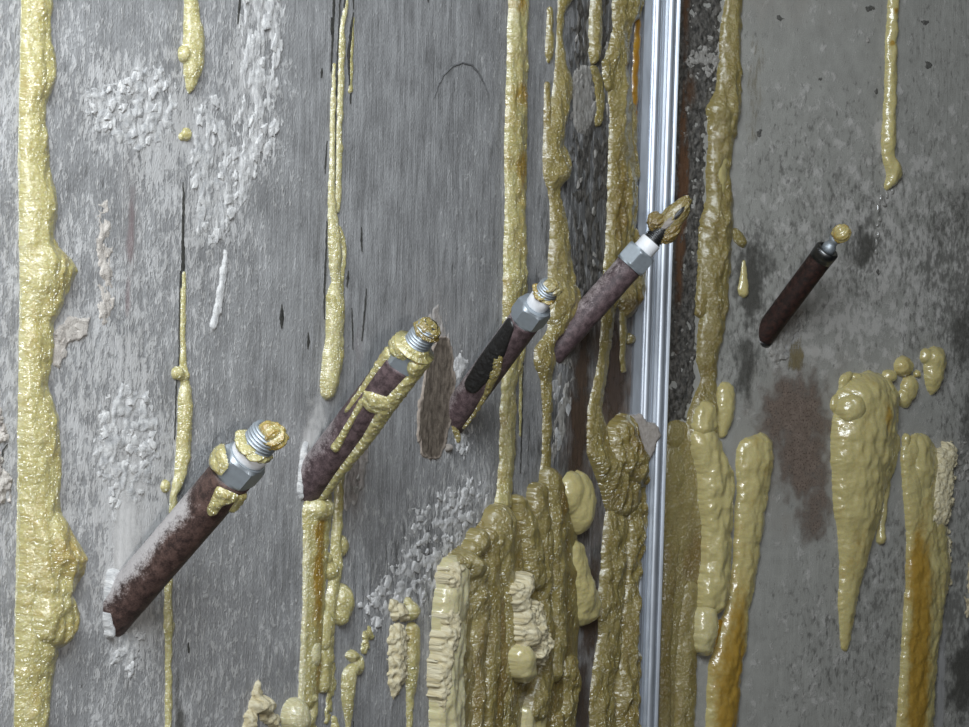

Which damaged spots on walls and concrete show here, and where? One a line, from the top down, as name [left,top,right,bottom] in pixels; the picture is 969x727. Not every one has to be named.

crack [324,0,354,189]
crack [174,182,185,440]
crack [321,221,329,319]
spalling [416,304,474,460]
leakage [936,645,969,727]